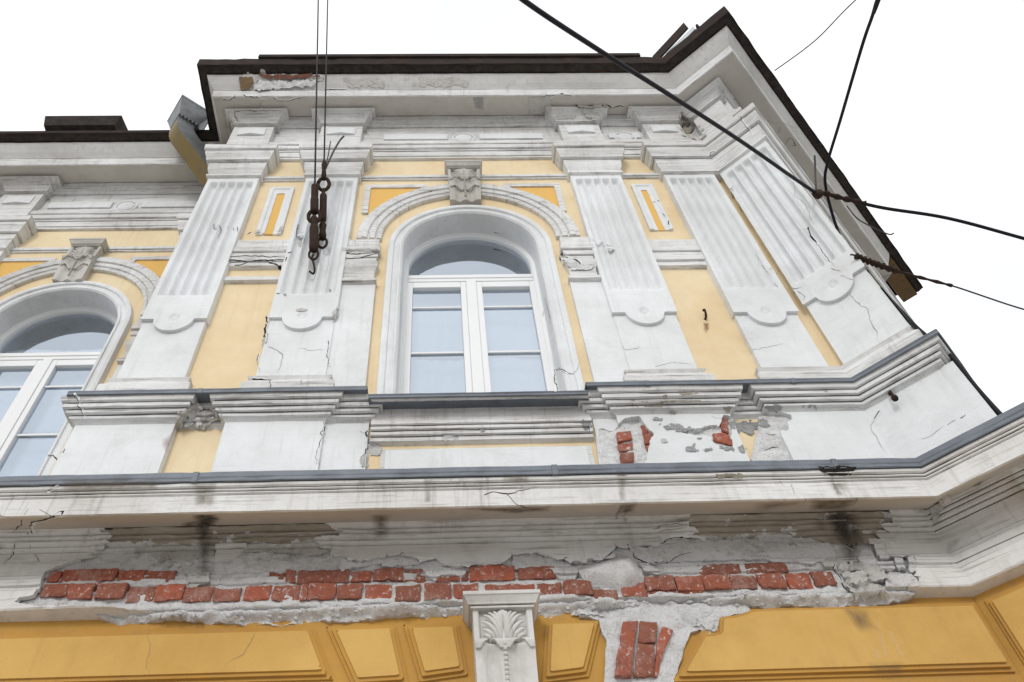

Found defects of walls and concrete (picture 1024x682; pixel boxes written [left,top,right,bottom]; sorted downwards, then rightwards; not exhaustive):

spalling [238,69,324,91]
crack [793,183,877,331]
crack [252,341,331,387]
spalling [581,390,791,464]
crack [0,449,65,564]
leakage [187,515,216,536]
crack [484,488,534,508]
leakage [816,501,856,552]
spalling [20,495,952,682]